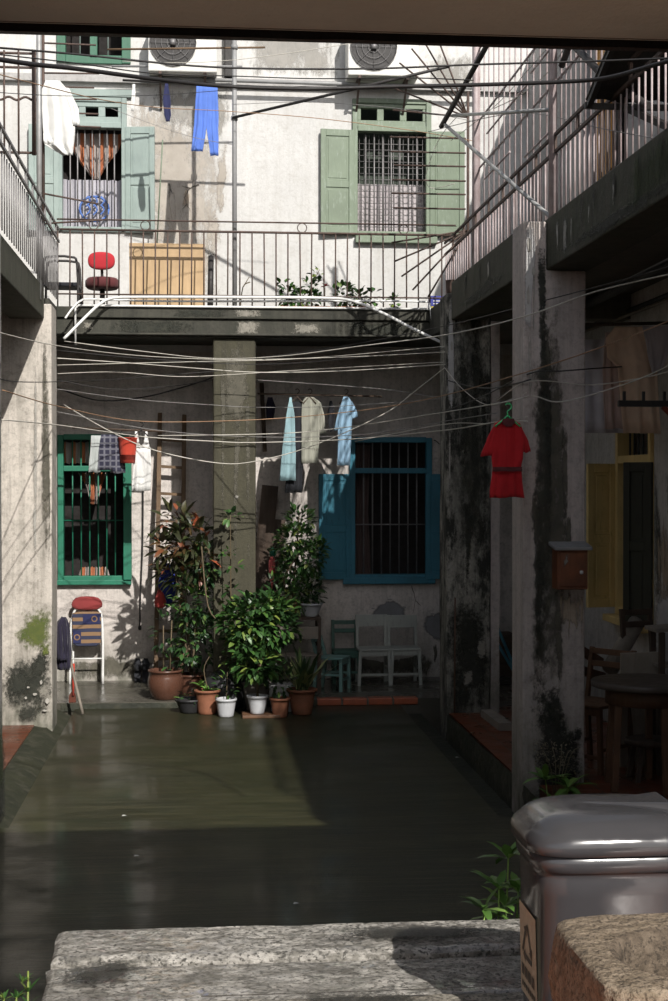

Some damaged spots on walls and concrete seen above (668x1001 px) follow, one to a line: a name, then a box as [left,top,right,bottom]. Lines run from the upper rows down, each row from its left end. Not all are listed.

leakage [457,346,487,578]
leakage [532,248,582,798]
mould [3,650,52,721]
leakage [328,646,437,674]
flaking render [371,599,406,615]
leakage [448,604,489,714]